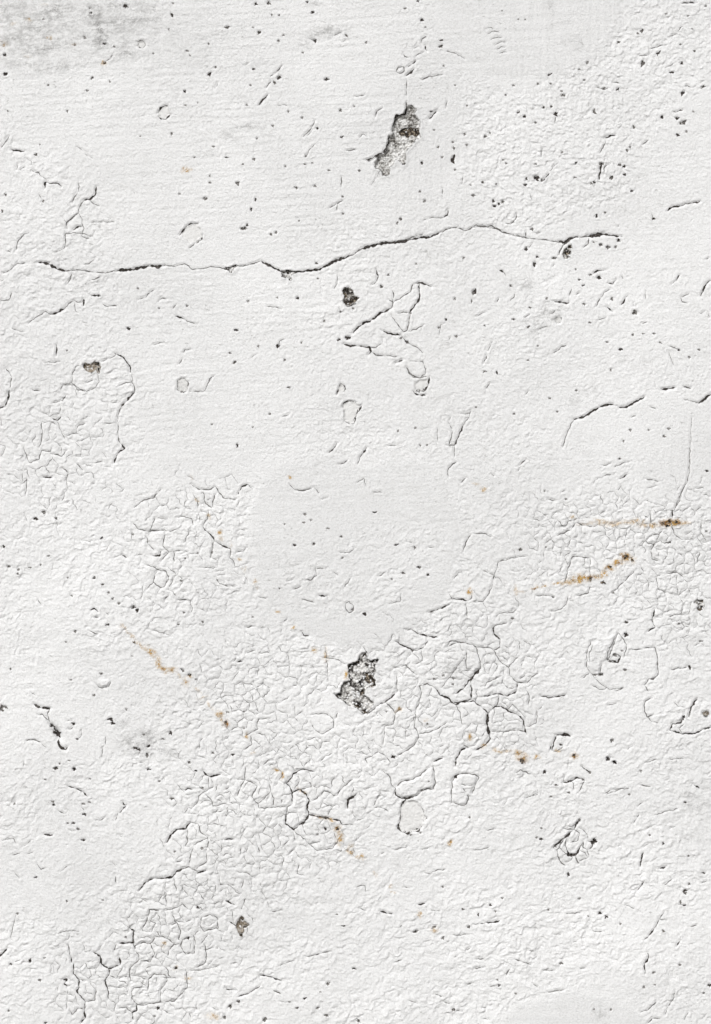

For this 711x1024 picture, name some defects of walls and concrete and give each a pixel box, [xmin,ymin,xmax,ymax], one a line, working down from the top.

spalling [358,101,421,185]
crack [2,137,619,378]
spalling [340,287,359,313]
crack [563,346,710,445]
crack [0,346,266,635]
corrosion [534,554,634,589]
spalling [335,652,378,715]
crack [53,450,711,1024]
spalling [236,916,249,937]